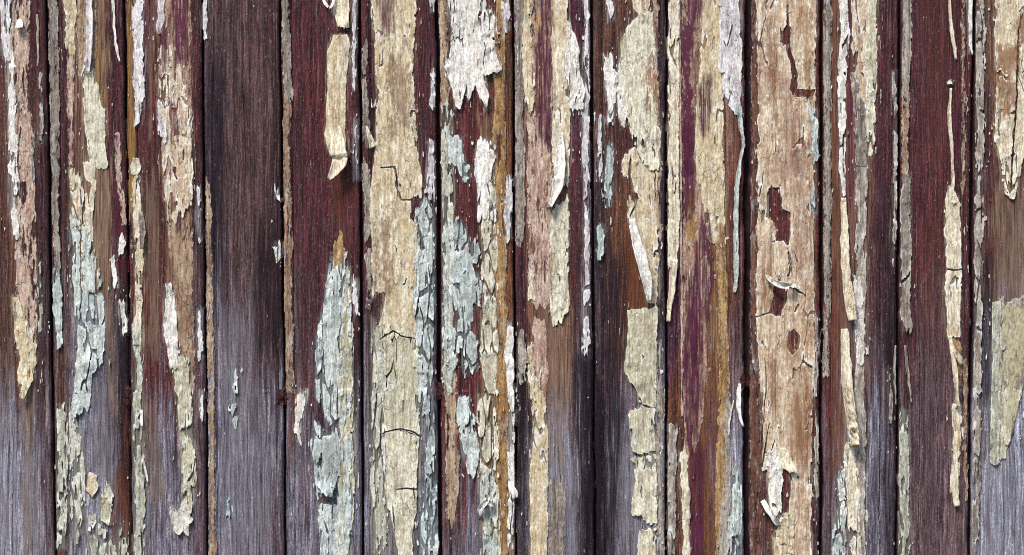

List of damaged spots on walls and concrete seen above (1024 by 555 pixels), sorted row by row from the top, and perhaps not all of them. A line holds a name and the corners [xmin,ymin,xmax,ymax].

peeling [0,0,150,555]
peeling [127,0,243,555]
crack [381,166,410,200]
crack [380,331,415,362]
peeling [273,0,915,555]
peeling [944,0,1024,555]